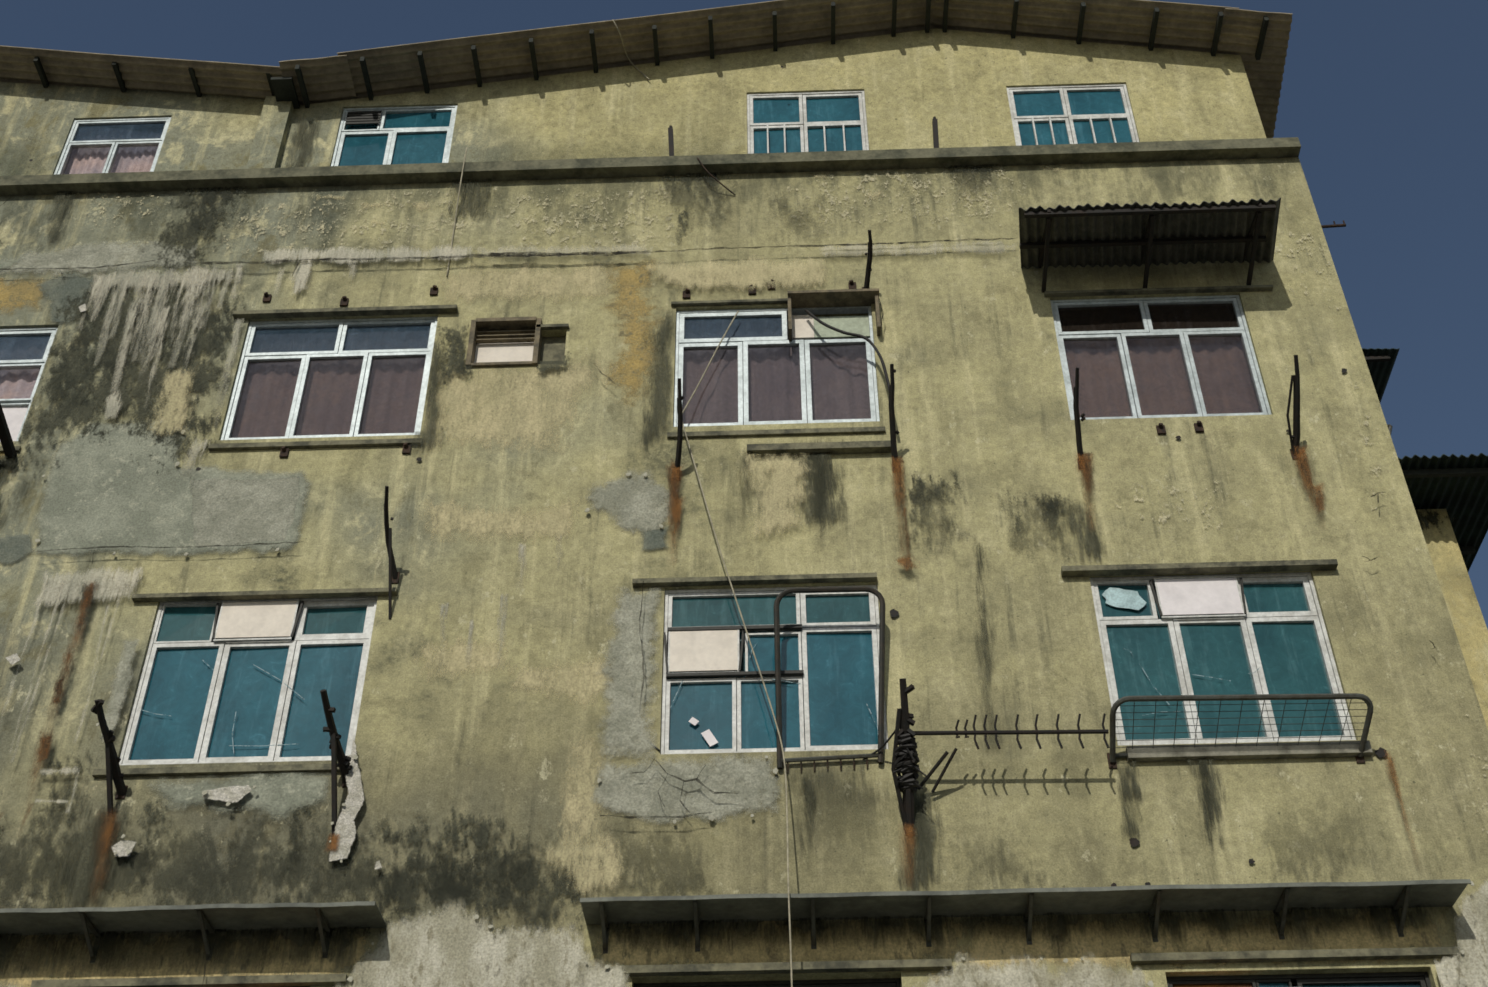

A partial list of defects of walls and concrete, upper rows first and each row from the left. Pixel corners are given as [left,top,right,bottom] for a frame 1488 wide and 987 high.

damp [0,186,246,523]
damp [743,451,846,533]
corrosion [893,457,908,537]
damp [909,475,952,511]
damp [1014,497,1102,560]
corrosion [1078,454,1093,491]
corrosion [1296,448,1324,510]
corrosion [52,582,95,704]
crack [638,581,646,706]
spalling [329,740,364,863]
crack [600,758,738,819]
damp [0,742,621,987]